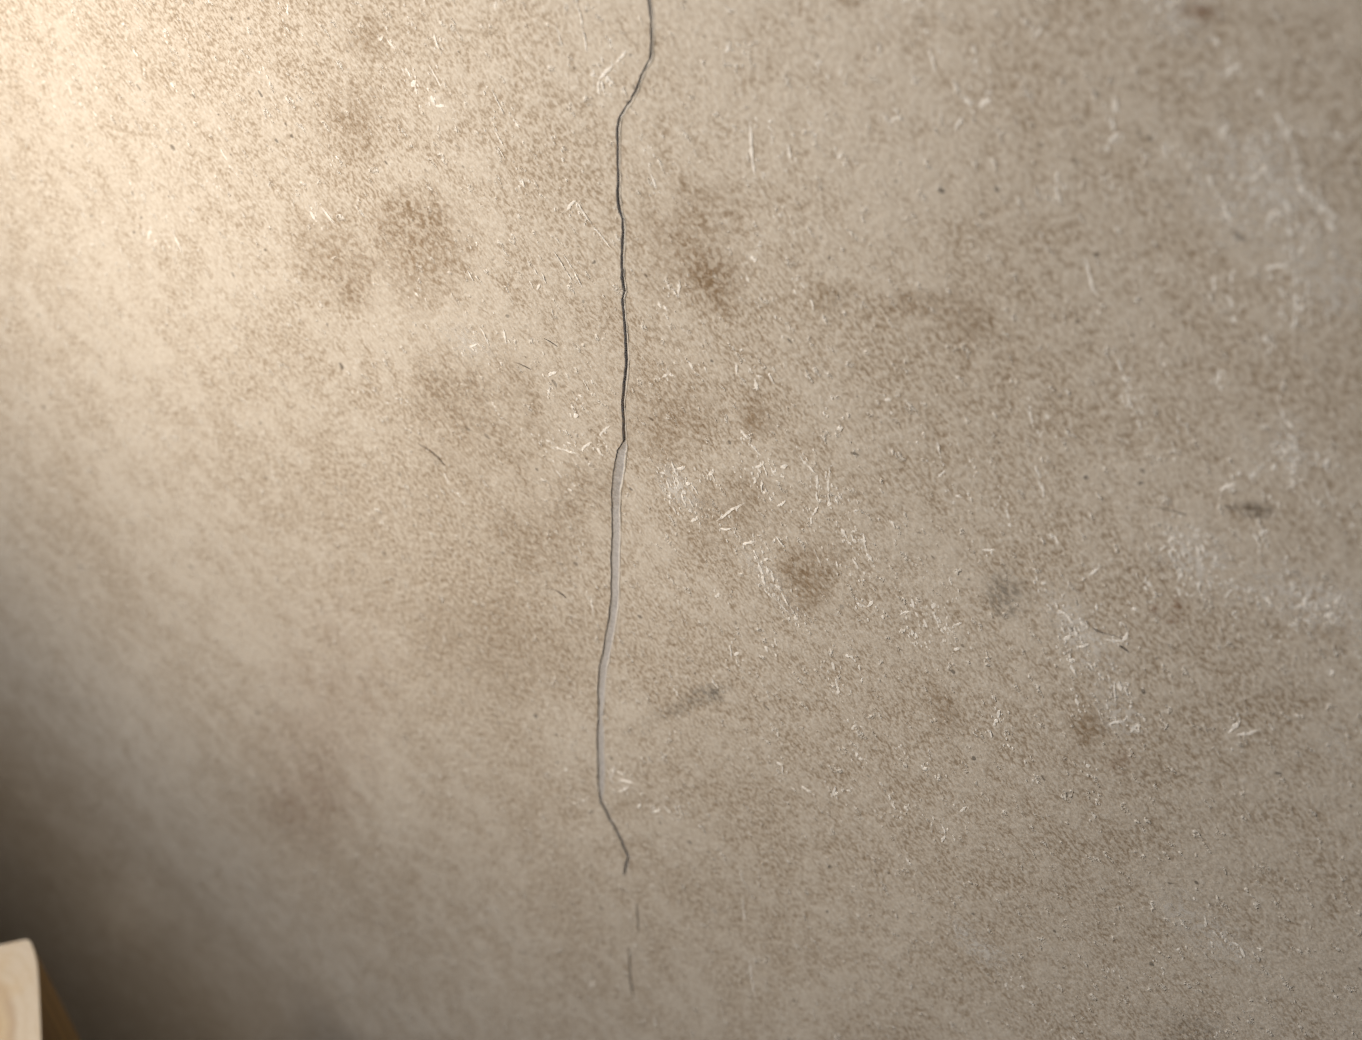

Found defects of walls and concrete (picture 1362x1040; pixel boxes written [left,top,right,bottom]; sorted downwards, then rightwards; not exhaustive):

crack [597,0,655,998]